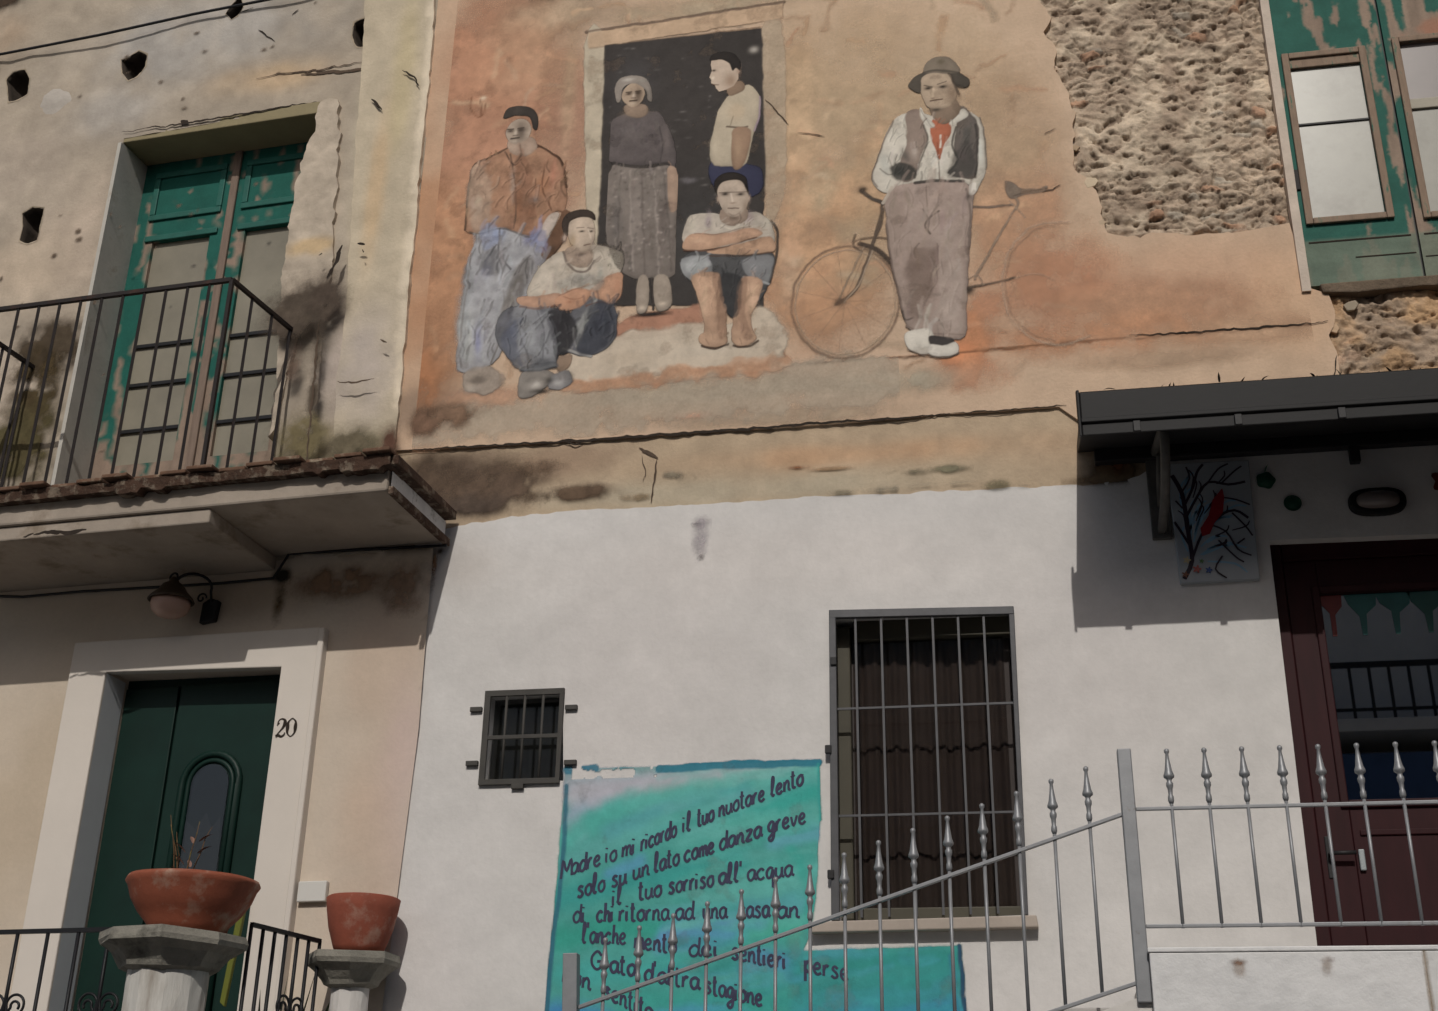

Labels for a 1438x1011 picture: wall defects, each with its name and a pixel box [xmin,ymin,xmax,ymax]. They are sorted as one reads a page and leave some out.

spalling [1040,0,1290,238]
damp [0,320,79,479]
damp [266,271,468,459]
spalling [1329,290,1438,374]
damp [416,455,607,514]
damp [304,568,418,608]